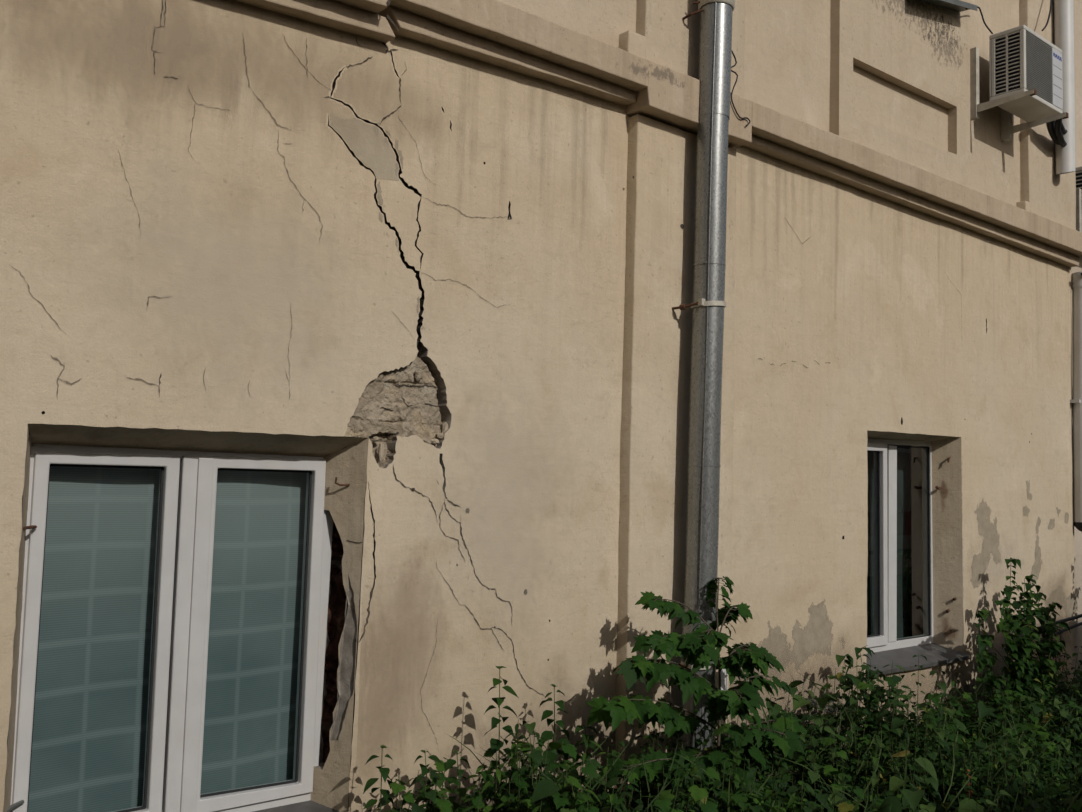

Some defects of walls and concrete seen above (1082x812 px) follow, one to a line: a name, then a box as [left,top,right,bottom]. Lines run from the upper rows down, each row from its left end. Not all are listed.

crack [151,0,231,158]
crack [243,37,323,237]
crack [282,0,506,351]
crack [16,269,66,334]
spalling [342,341,451,468]
spalling [314,520,360,769]
crack [347,482,376,643]
crack [393,453,548,751]